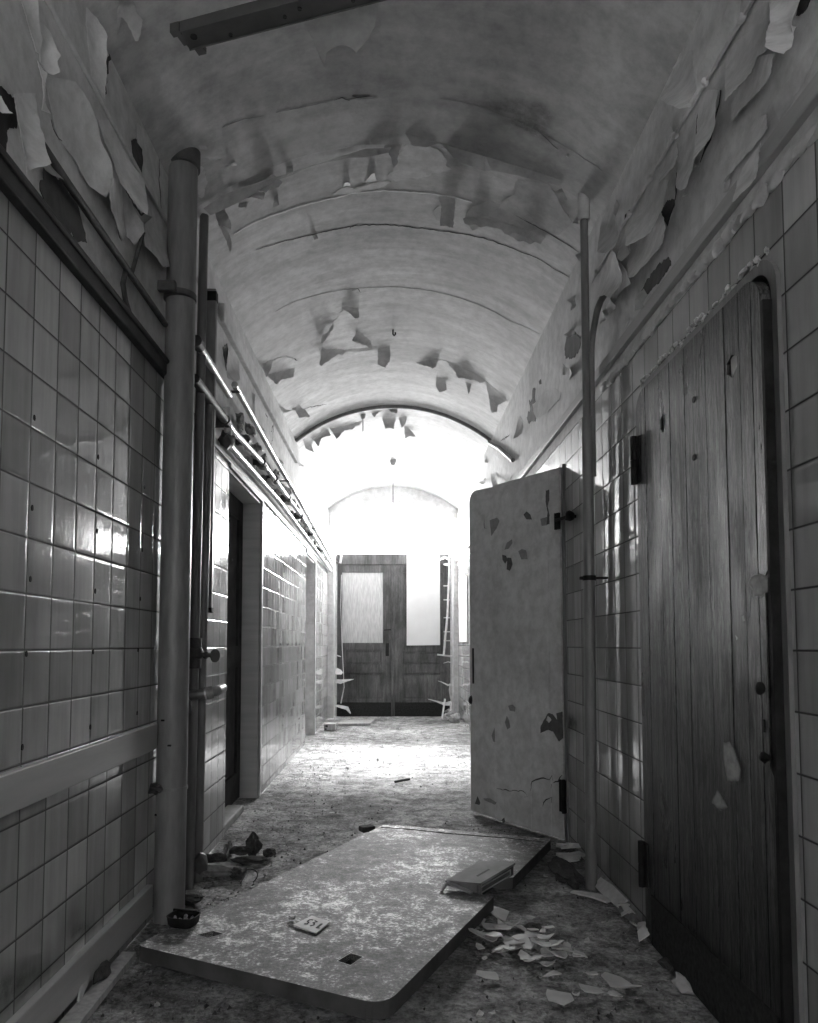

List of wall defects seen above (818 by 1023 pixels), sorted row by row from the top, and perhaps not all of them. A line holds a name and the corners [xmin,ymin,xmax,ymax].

peeling [86,0,143,100]
peeling [0,0,87,243]
peeling [99,120,170,267]
peeling [198,133,580,254]
peeling [597,0,818,392]
peeling [319,306,391,368]
peeling [261,356,297,384]
peeling [279,404,327,418]
peeling [303,421,362,452]
peeling [372,409,416,438]
peeling [416,358,508,413]
peeling [500,379,561,442]